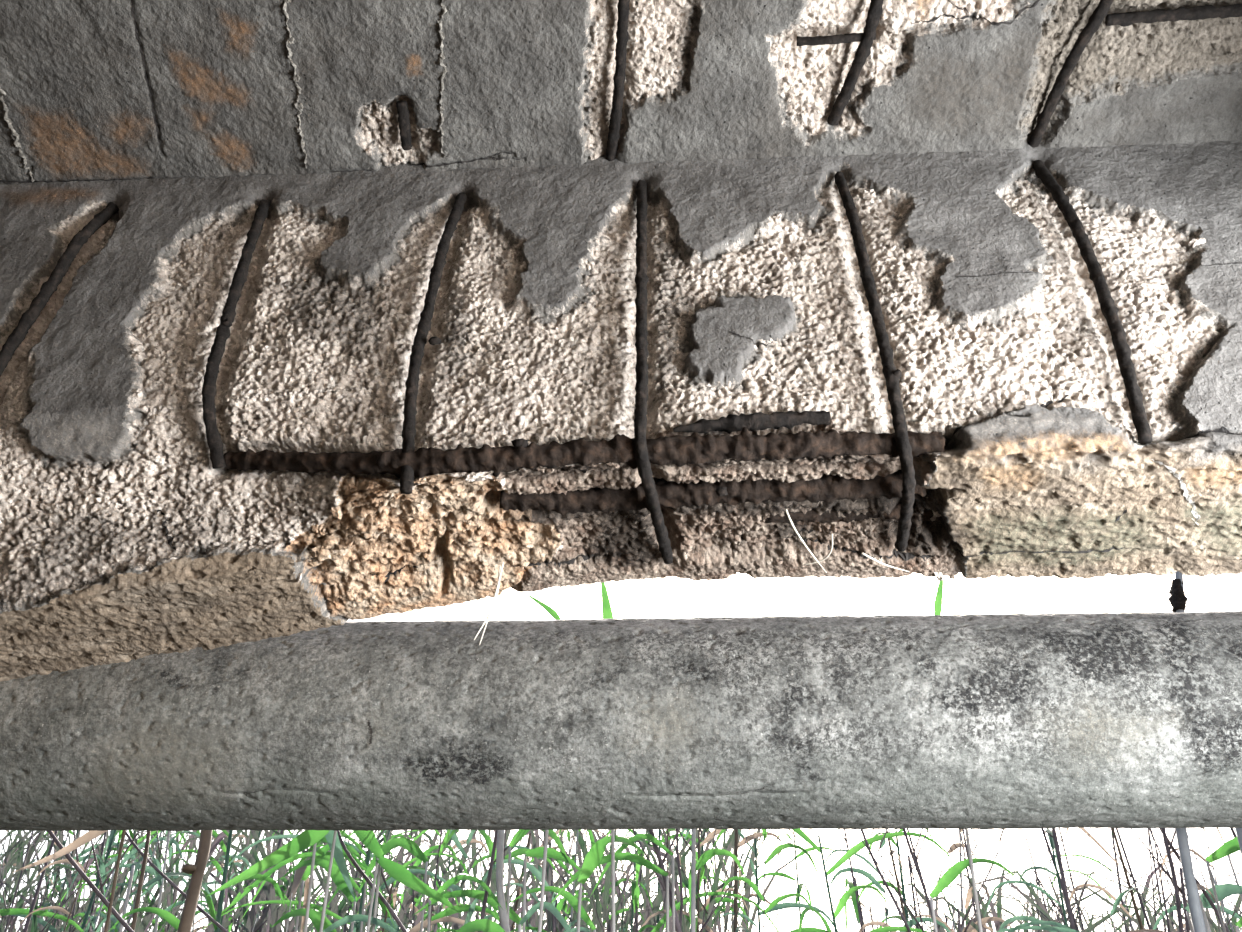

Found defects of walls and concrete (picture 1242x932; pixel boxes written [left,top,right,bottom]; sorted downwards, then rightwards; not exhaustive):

crack [911,0,1040,26]
spalling [578,0,705,163]
spalling [764,0,1242,147]
spalling [353,94,450,170]
spalling [0,162,1234,624]
rust [971,433,1123,488]
crack [730,509,1131,561]